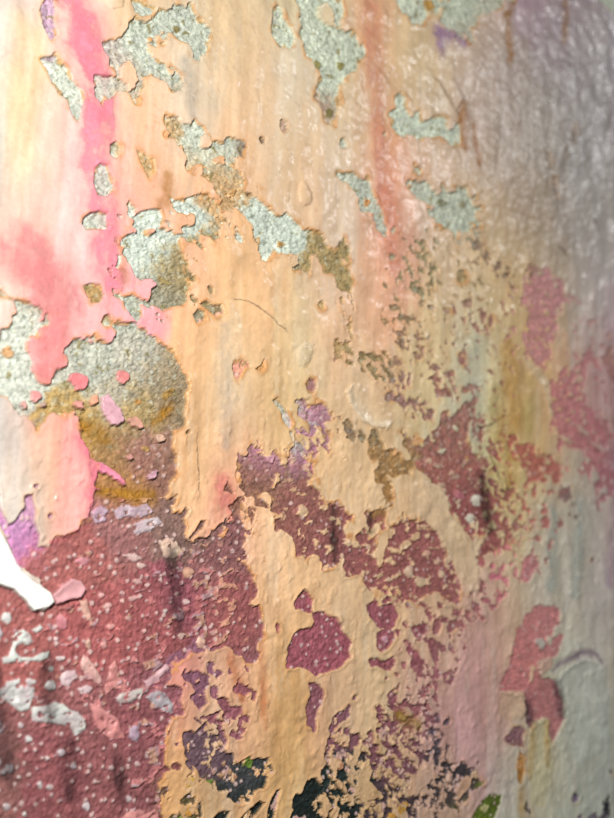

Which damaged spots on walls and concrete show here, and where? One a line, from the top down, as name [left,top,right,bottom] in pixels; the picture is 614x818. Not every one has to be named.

peeling [39,0,213,123]
peeling [270,0,369,128]
peeling [396,0,517,46]
peeling [406,161,614,547]
peeling [0,111,543,818]
peeling [498,602,614,818]